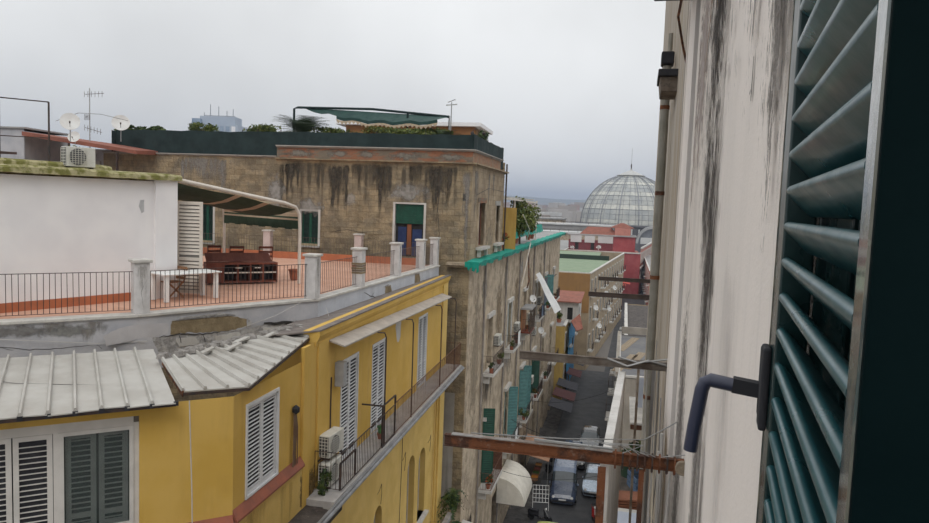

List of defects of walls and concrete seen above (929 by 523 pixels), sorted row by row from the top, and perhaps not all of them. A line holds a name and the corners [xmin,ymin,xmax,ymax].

water stain [280,163,477,251]
spalling [153,313,300,353]